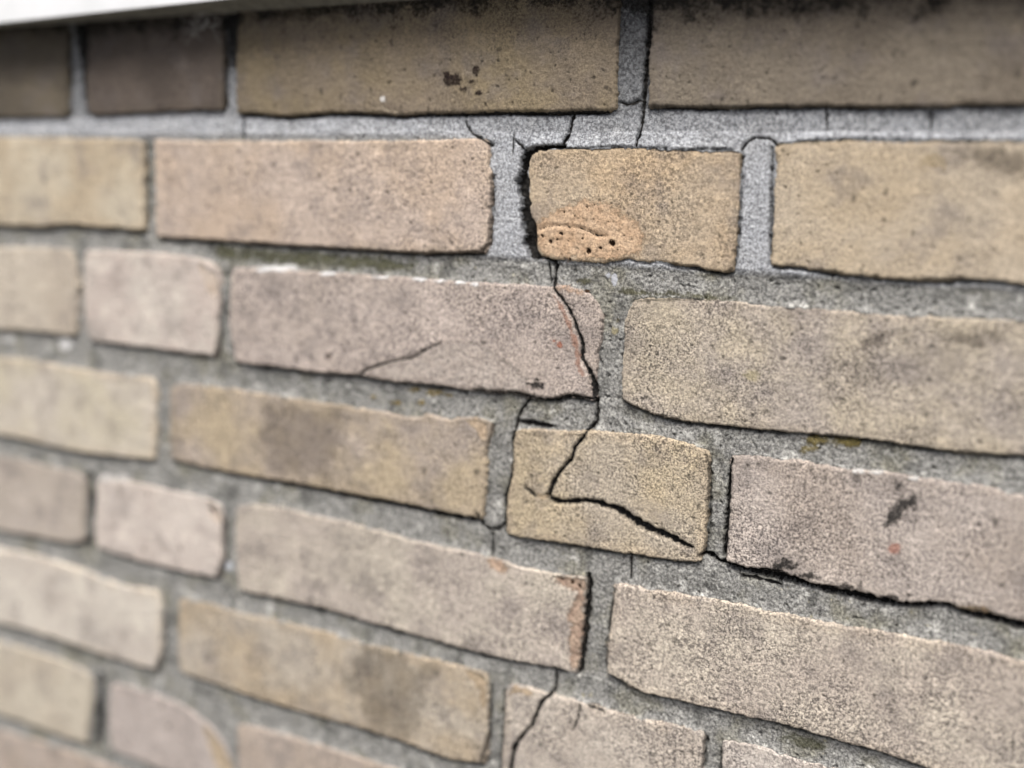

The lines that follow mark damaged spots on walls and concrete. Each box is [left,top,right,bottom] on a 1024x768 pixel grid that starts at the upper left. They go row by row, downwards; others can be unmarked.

crack [621,0,655,147]
crack [466,121,527,155]
crack [562,115,576,147]
crack [741,137,779,151]
spalling [536,198,644,260]
crack [361,343,441,375]
crack [474,256,1024,626]
crack [510,667,559,768]